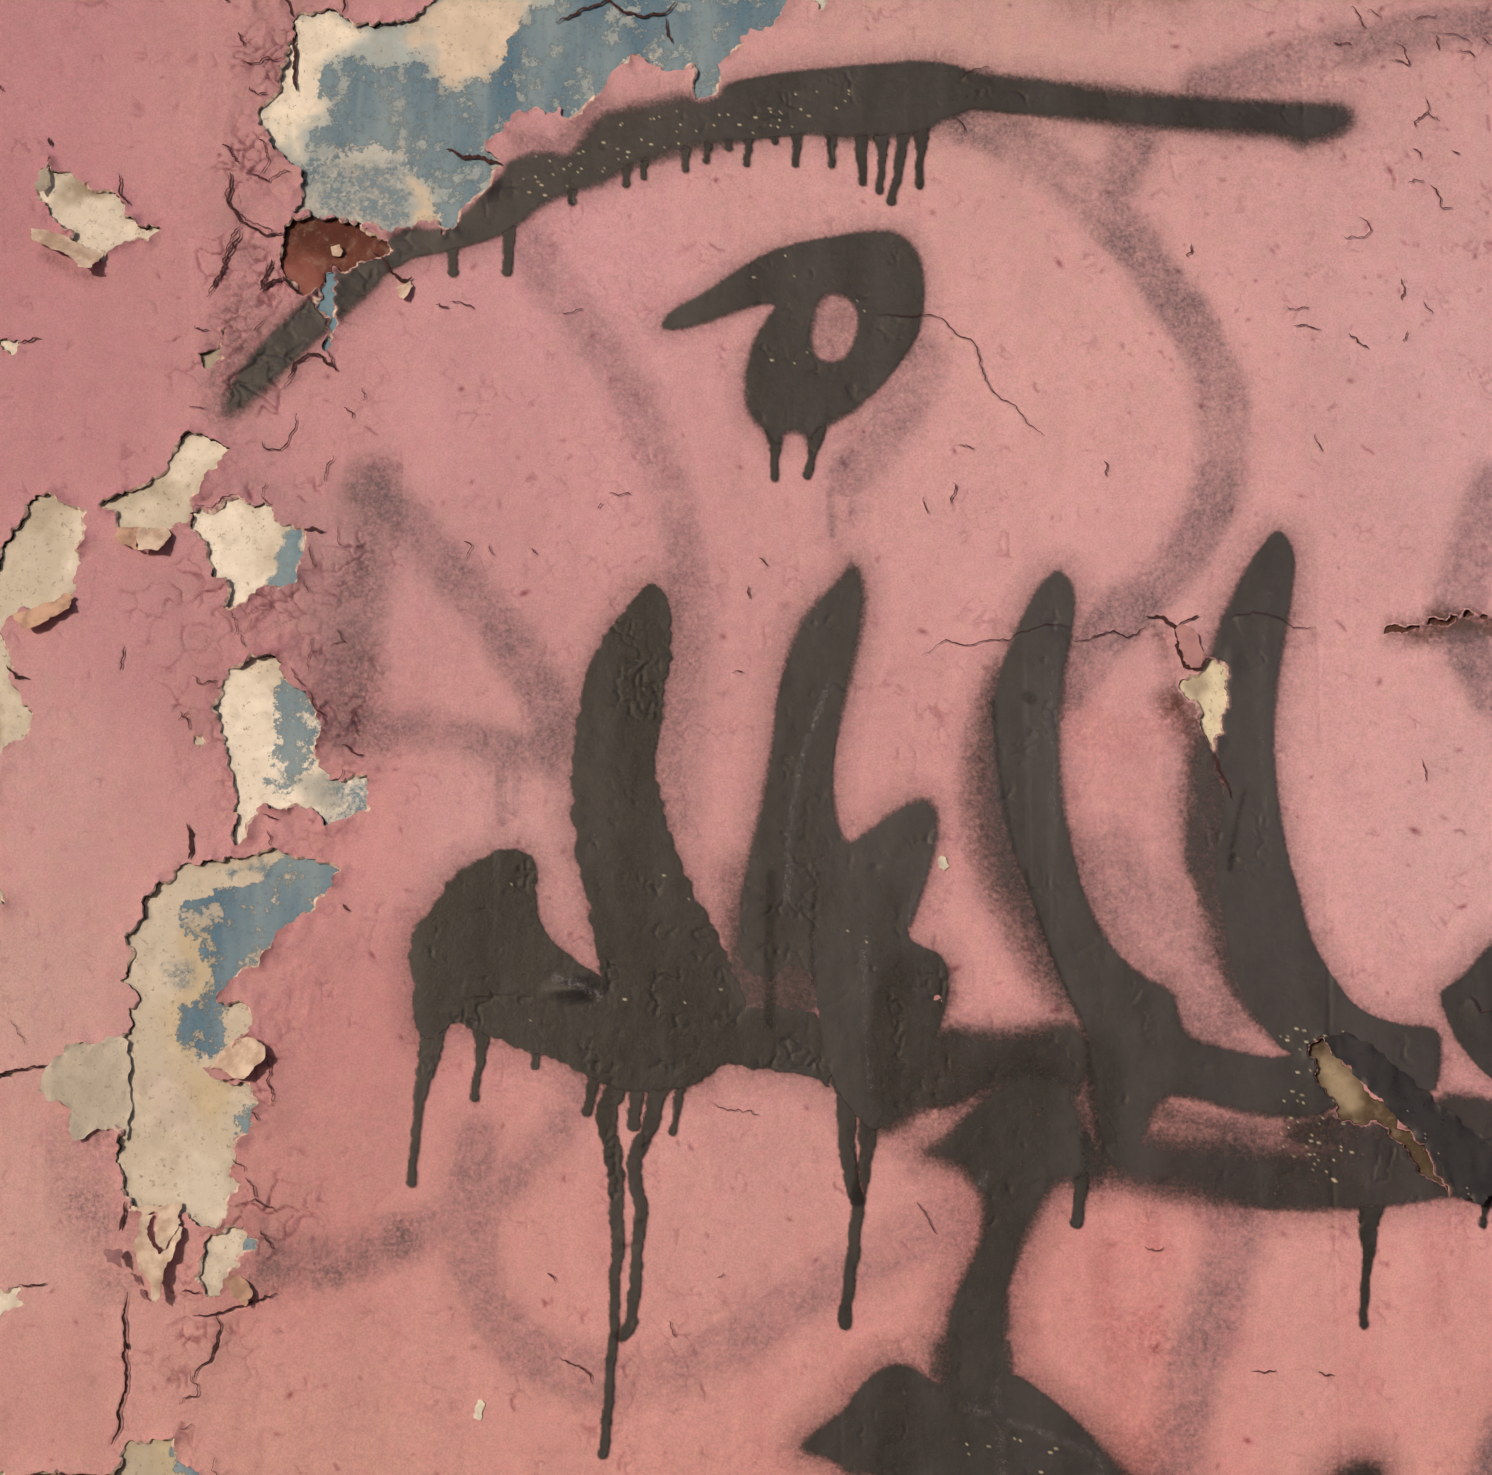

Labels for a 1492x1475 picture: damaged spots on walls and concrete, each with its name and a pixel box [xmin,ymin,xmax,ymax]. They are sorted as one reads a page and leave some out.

peeling [31,137,161,268]
crack [194,134,300,331]
peeling [208,0,786,378]
crack [261,351,365,505]
peeling [0,431,323,753]
crack [291,628,363,781]
peeling [1146,615,1232,798]
crack [1384,610,1488,634]
peeling [0,654,369,1307]
crack [233,1160,275,1249]
peeling [1308,1032,1492,1205]
crack [30,1292,129,1475]